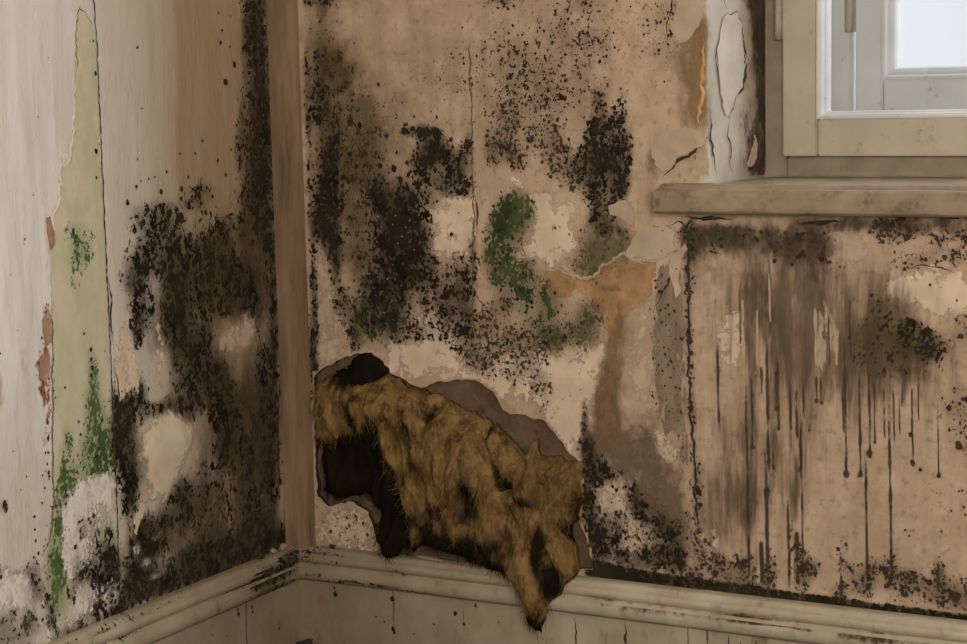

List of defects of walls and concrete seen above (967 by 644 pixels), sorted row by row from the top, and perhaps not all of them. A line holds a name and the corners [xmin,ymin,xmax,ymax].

peeling [39,6,140,621]
leakage [0,0,427,644]
flaking render [315,442,382,550]
leakage [304,0,690,412]
flaking render [394,175,688,464]
peeling [650,0,747,178]
crack [709,99,736,172]
leakage [720,614,811,632]
leakage [577,217,967,611]
leakage [839,632,903,644]